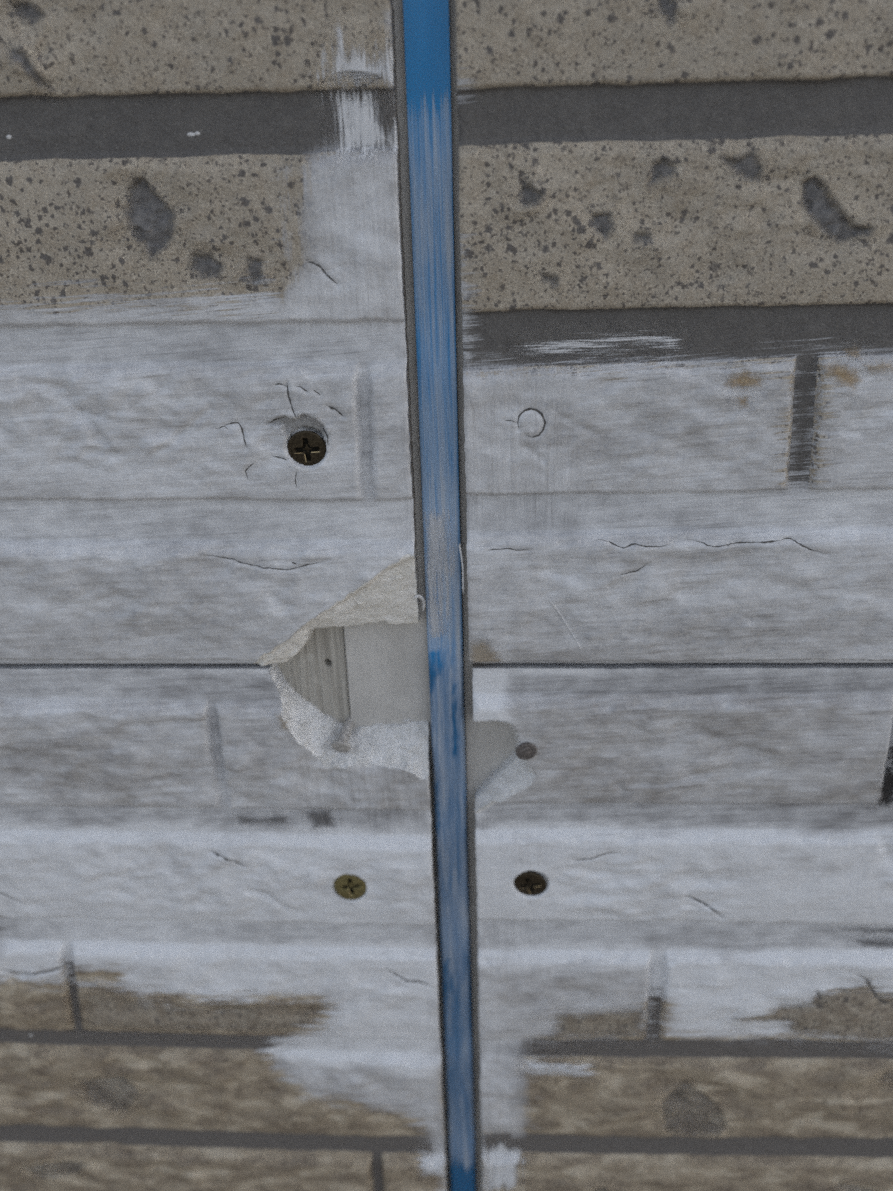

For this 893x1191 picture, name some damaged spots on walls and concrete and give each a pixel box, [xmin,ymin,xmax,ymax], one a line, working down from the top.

spalling [253,546,431,780]
spalling [473,720,536,814]